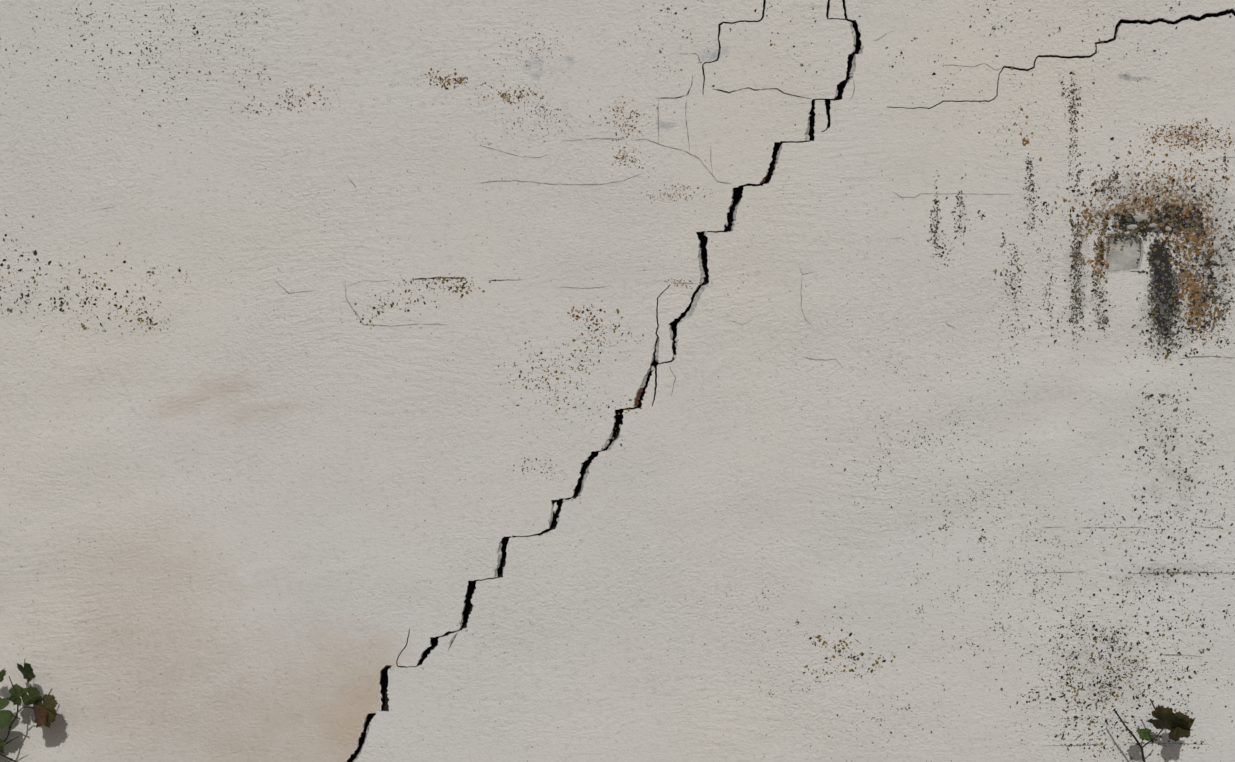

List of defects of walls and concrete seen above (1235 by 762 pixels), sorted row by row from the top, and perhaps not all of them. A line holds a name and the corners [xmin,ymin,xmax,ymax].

damp [0,2,277,106]
crack [888,8,1235,109]
damp [0,215,191,336]
crack [345,0,886,762]
damp [863,1,1235,762]
corrosion [1046,118,1235,355]